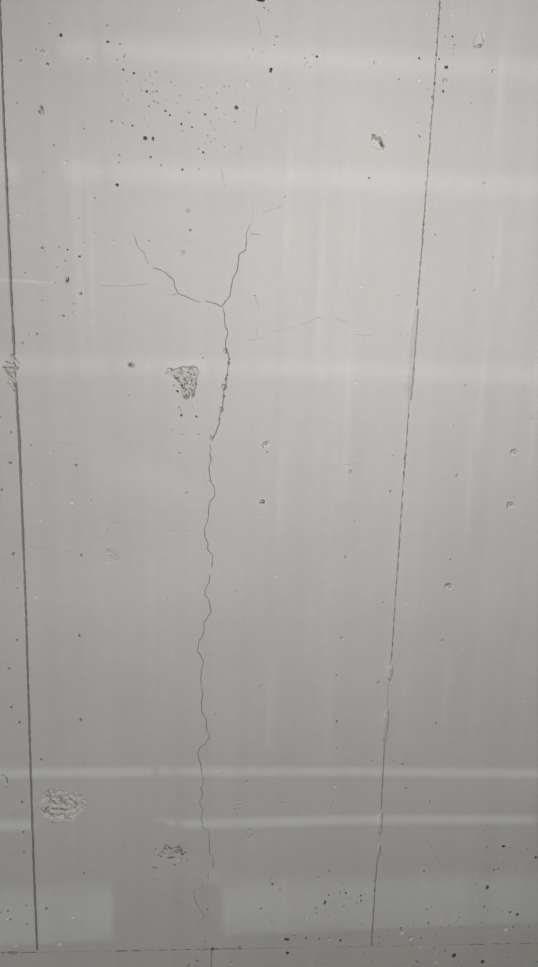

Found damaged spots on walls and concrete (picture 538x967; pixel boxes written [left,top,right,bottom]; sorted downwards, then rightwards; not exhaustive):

spalling [165,353,204,416]
crack [98,206,371,927]
spalling [39,788,88,823]